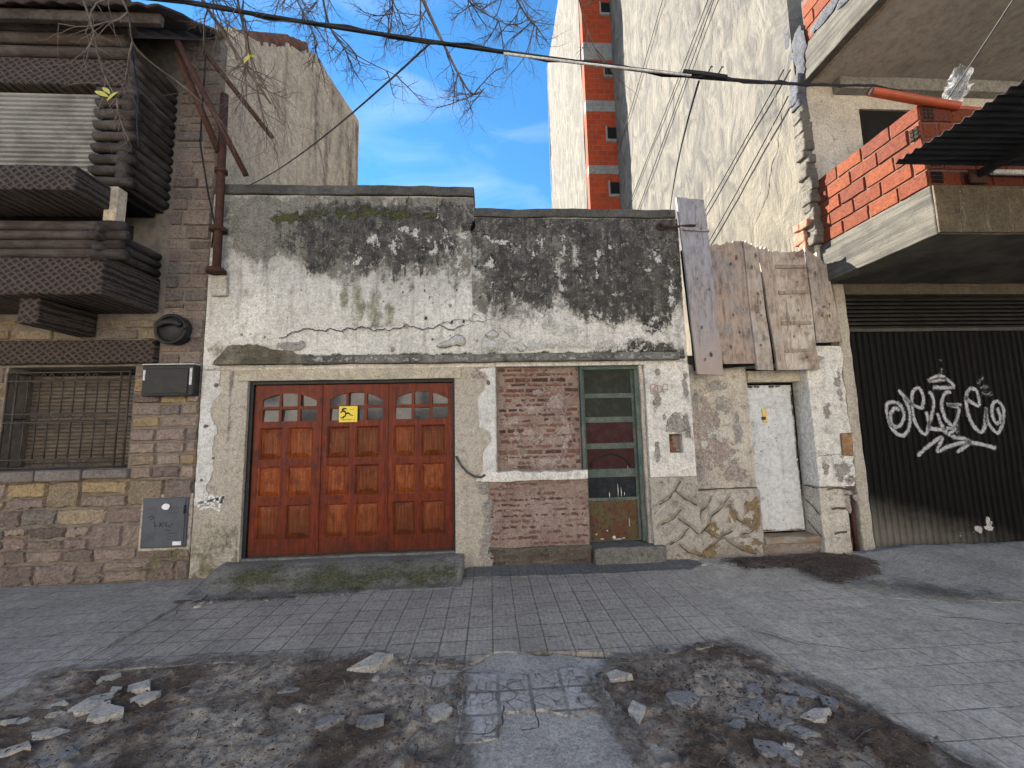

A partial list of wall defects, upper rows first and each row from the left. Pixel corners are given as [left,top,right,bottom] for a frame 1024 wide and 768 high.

crack [279,314,513,339]
water stain [224,161,685,359]
peeling [194,371,221,506]
peeling [312,235,684,566]
peeling [652,371,777,488]